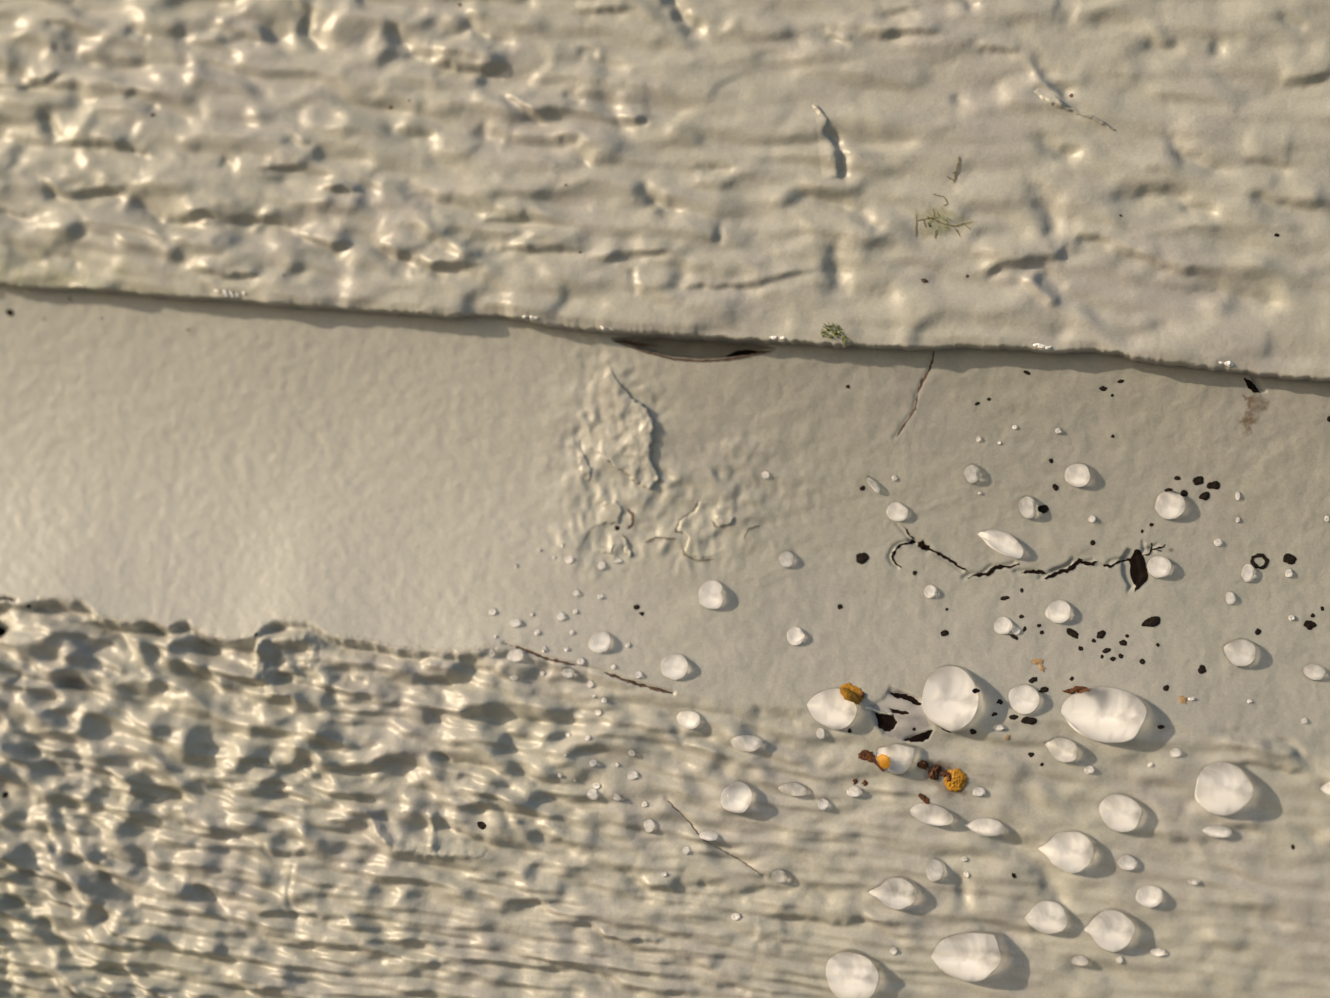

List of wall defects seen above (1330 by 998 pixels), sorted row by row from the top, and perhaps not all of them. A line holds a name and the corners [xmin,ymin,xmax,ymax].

peeling [569,361,660,491]
crack [897,351,935,436]
peeling [581,499,634,557]
crack [891,524,1173,591]
spalling [863,688,952,742]